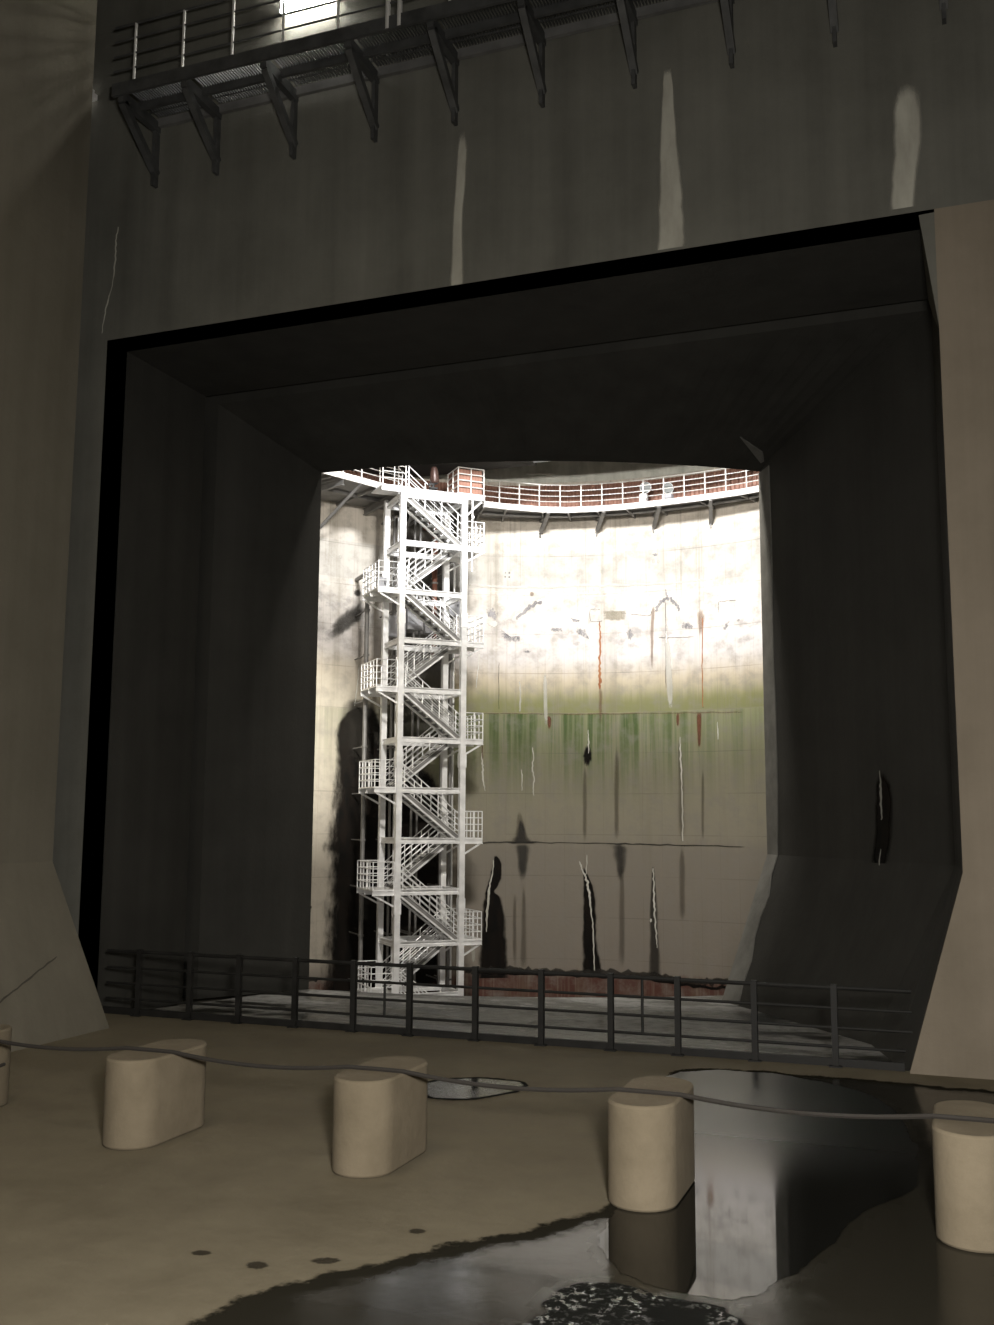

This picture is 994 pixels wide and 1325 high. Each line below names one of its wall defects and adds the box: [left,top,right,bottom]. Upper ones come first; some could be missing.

leakage [309,511,457,993]
leakage [583,730,591,765]
leakage [516,822,531,875]
leakage [465,856,728,990]
crack [482,743,741,974]